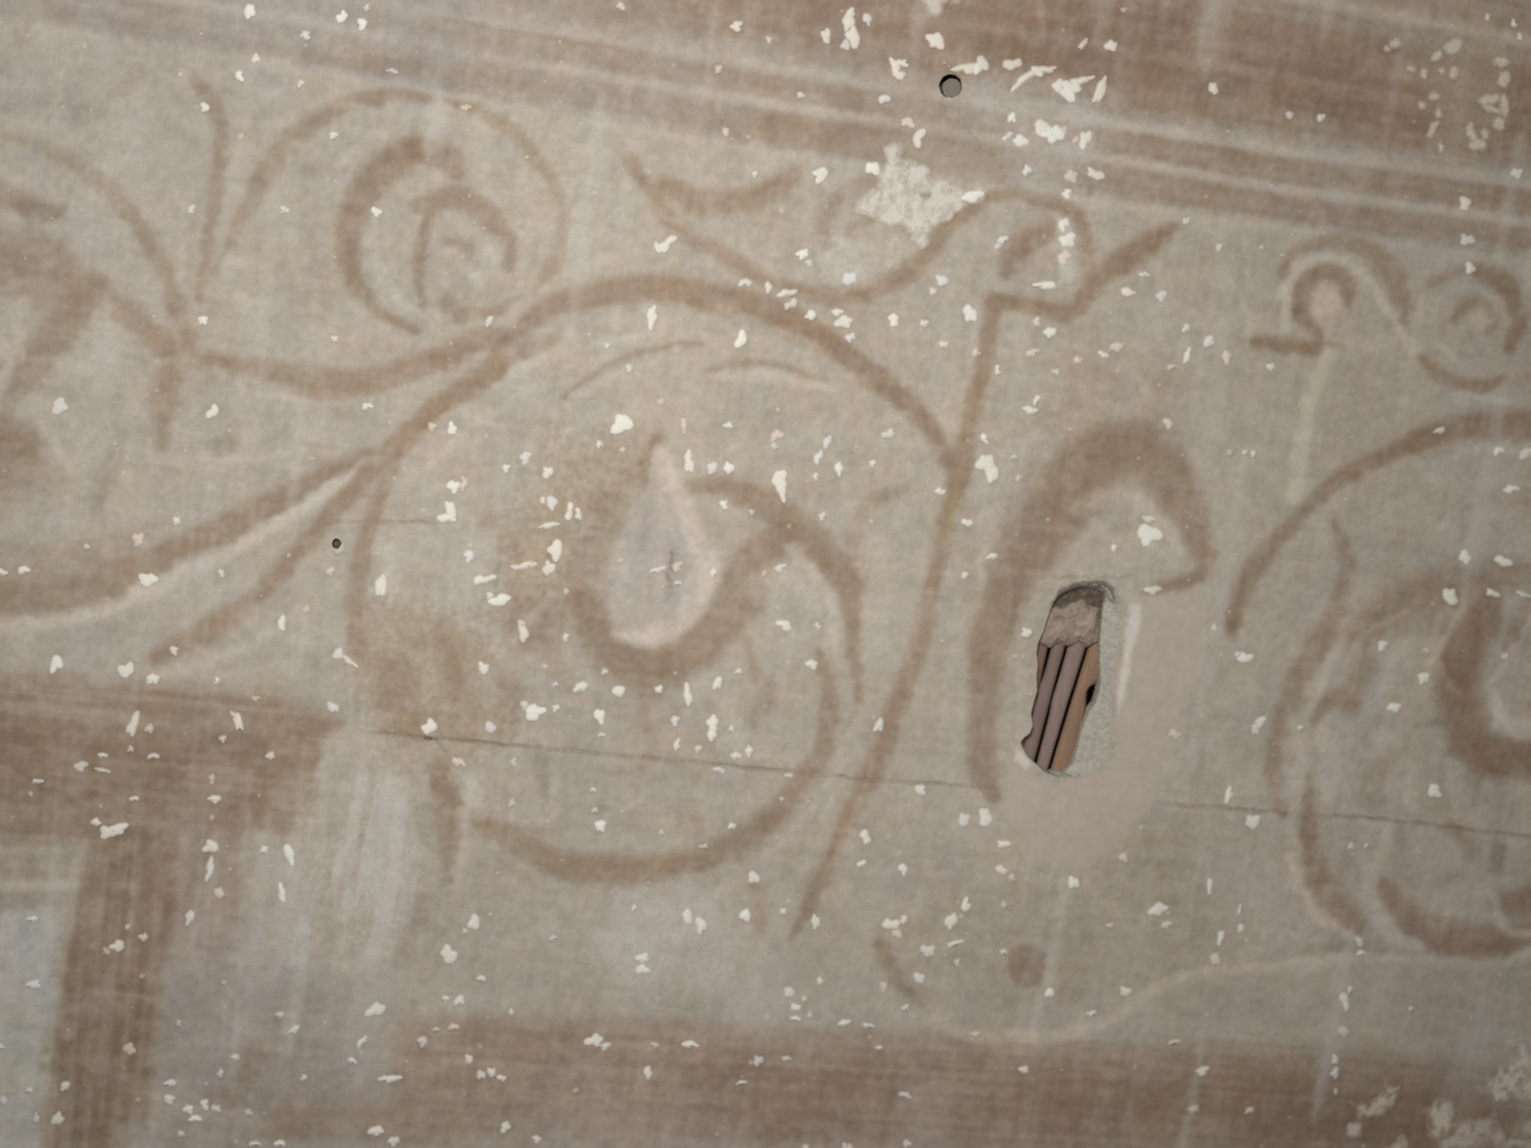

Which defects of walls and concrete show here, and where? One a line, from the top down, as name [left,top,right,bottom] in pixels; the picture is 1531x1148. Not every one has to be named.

peeling [919,0,963,50]
spalling [852,116,991,273]
peeling [994,235,1009,250]
peeling [974,432,1024,484]
peeling [960,518,974,528]
peeling [1021,627,1033,638]
spalling [1032,584,1123,778]
spalling [1380,1032,1531,1148]